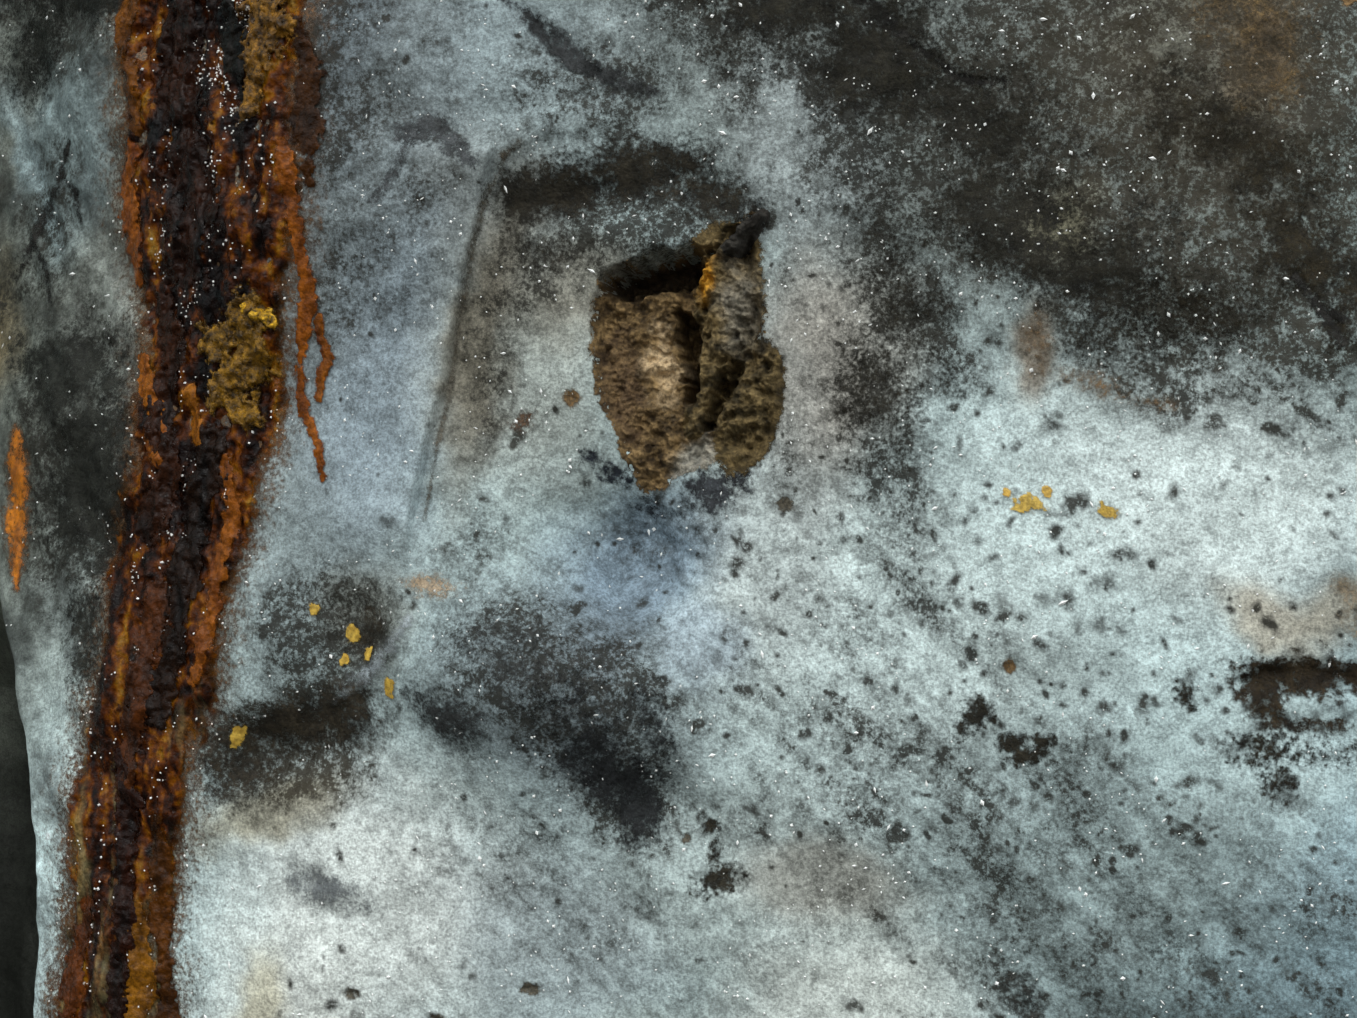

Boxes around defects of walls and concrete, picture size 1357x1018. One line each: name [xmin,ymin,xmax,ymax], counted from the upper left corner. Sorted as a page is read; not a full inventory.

leakage [484,130,774,277]
spalling [562,208,788,497]
leakage [680,0,1357,482]
rust [0,423,33,592]
rust [34,0,335,1018]